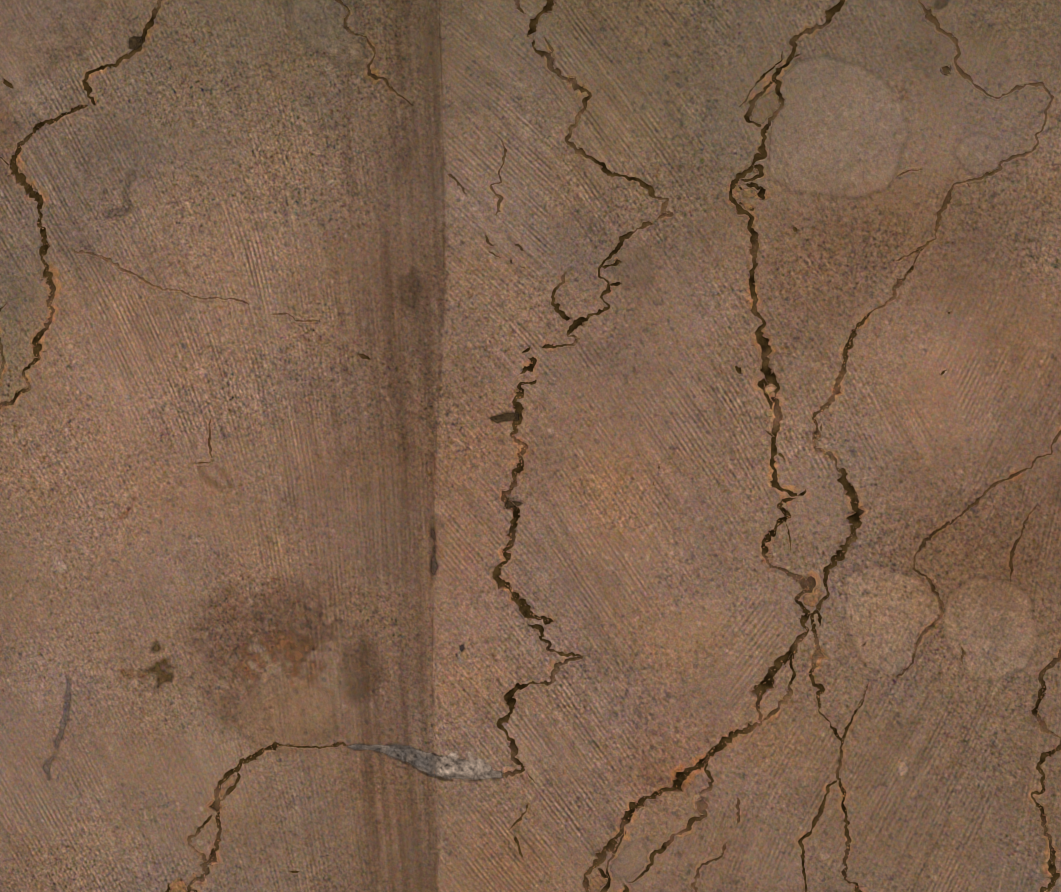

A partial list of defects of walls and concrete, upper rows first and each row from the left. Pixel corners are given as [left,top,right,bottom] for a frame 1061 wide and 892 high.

crack [334,0,413,107]
crack [0,0,319,414]
crack [446,139,525,271]
crack [196,417,216,467]
crack [488,0,676,857]
crack [563,0,1061,892]
water stain [239,672,335,751]
crack [162,739,347,892]